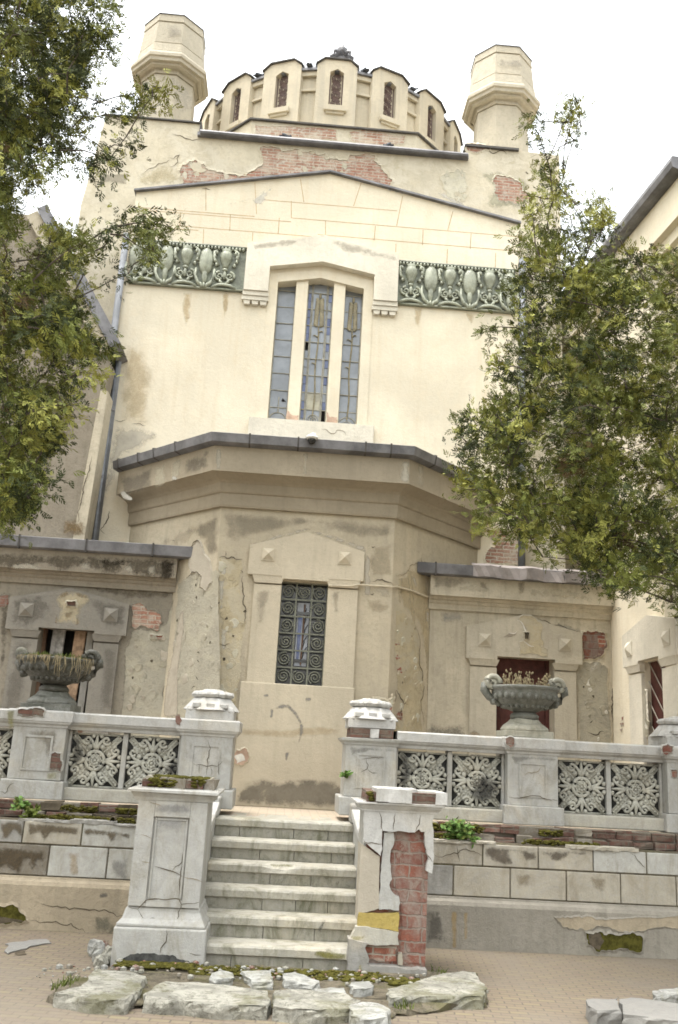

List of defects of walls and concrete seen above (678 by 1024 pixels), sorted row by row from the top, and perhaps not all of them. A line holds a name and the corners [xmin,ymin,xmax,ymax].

flaking render [177,124,402,194]
crack [221,556,246,619]
flaking render [119,540,247,738]
flaking render [575,635,624,743]
damp [240,781,340,804]
damp [0,823,129,871]
crack [32,834,199,953]
flaking render [553,914,678,955]